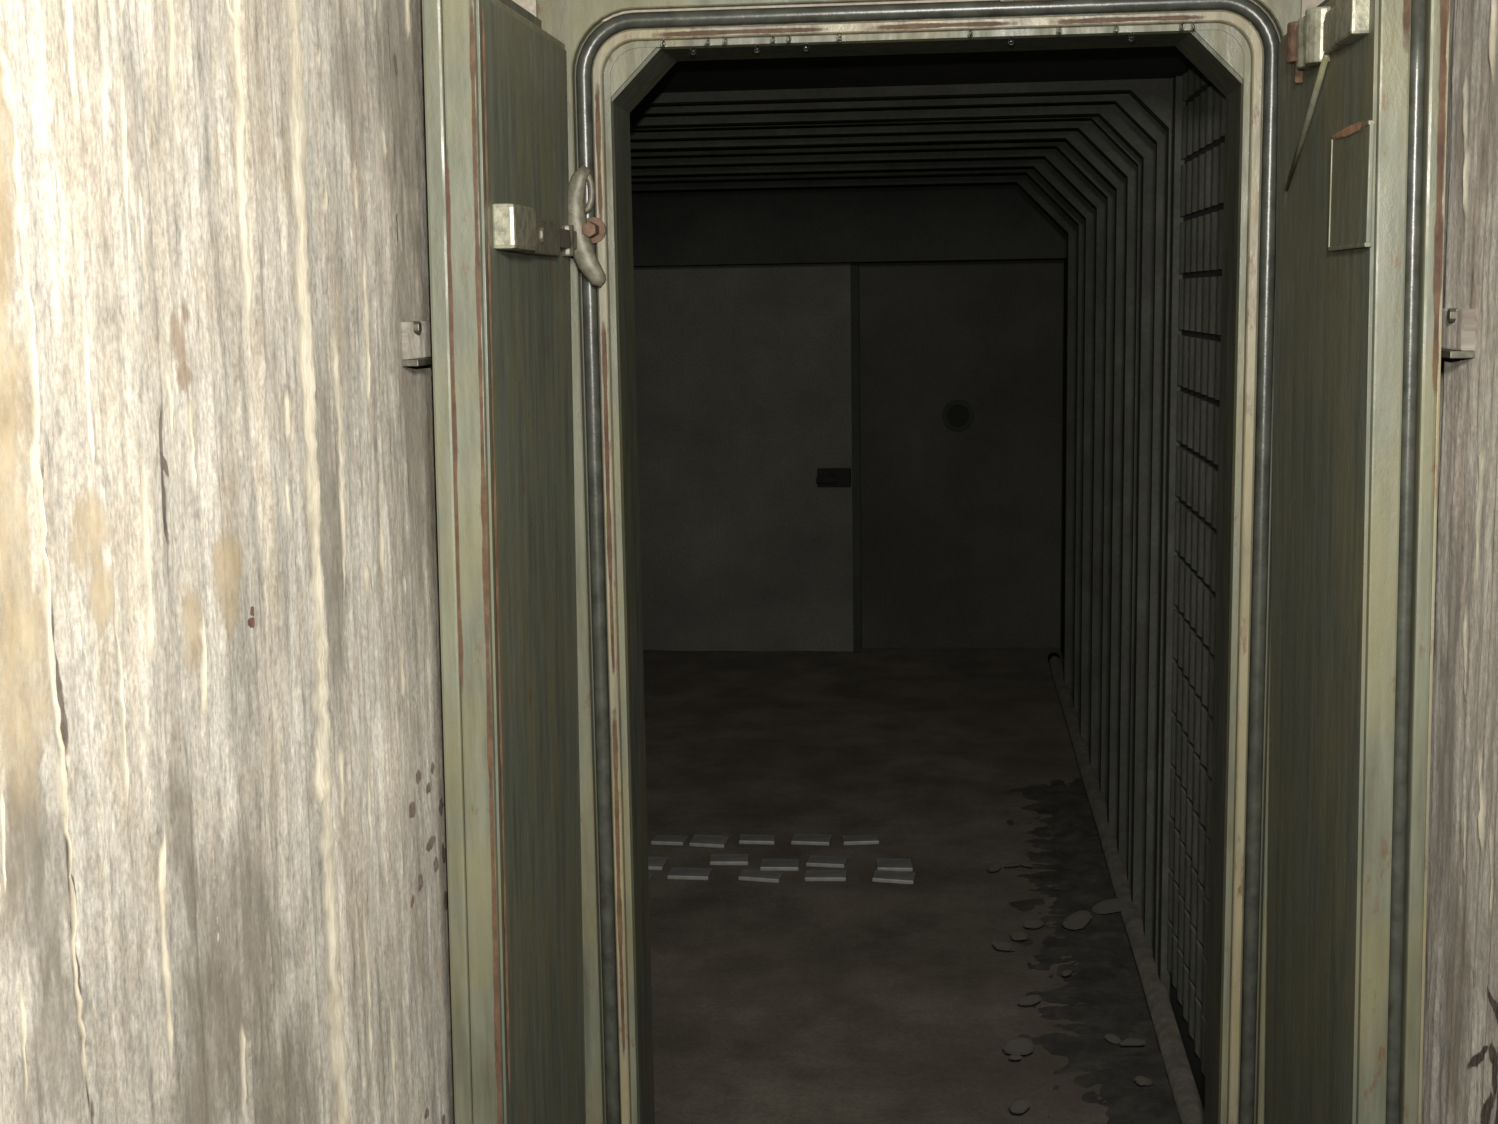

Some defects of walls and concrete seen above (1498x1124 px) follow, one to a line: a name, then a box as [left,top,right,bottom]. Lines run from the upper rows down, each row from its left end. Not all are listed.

crack [36,459,93,1124]
crack [159,411,169,545]